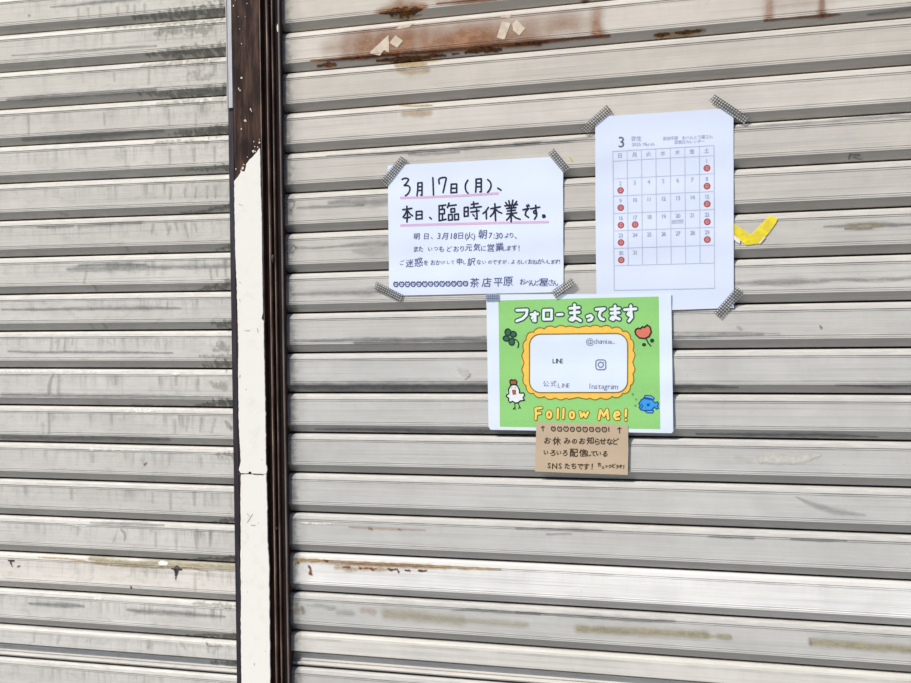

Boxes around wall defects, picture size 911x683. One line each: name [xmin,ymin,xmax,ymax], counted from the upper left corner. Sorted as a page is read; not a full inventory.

rust [764,9,838,21]
rust [310,0,610,68]
rust [654,29,706,38]
rust [295,559,501,575]